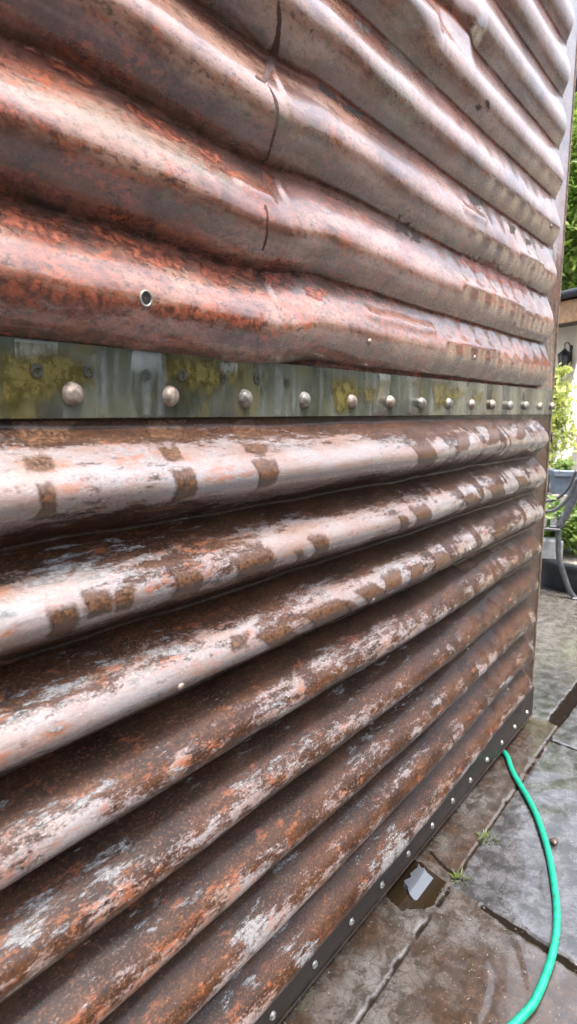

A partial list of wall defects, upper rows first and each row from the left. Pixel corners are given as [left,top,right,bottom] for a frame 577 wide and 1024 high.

crack [256,1,282,251]
rust [0,274,268,332]
rust [10,420,86,521]
rust [145,420,198,503]
rust [231,419,279,489]
peeling [13,535,154,587]
rust [48,585,135,637]
rust [229,529,508,651]
peeling [0,675,87,739]
peeling [356,822,414,873]
peeling [0,838,143,961]
peeling [221,897,319,1011]